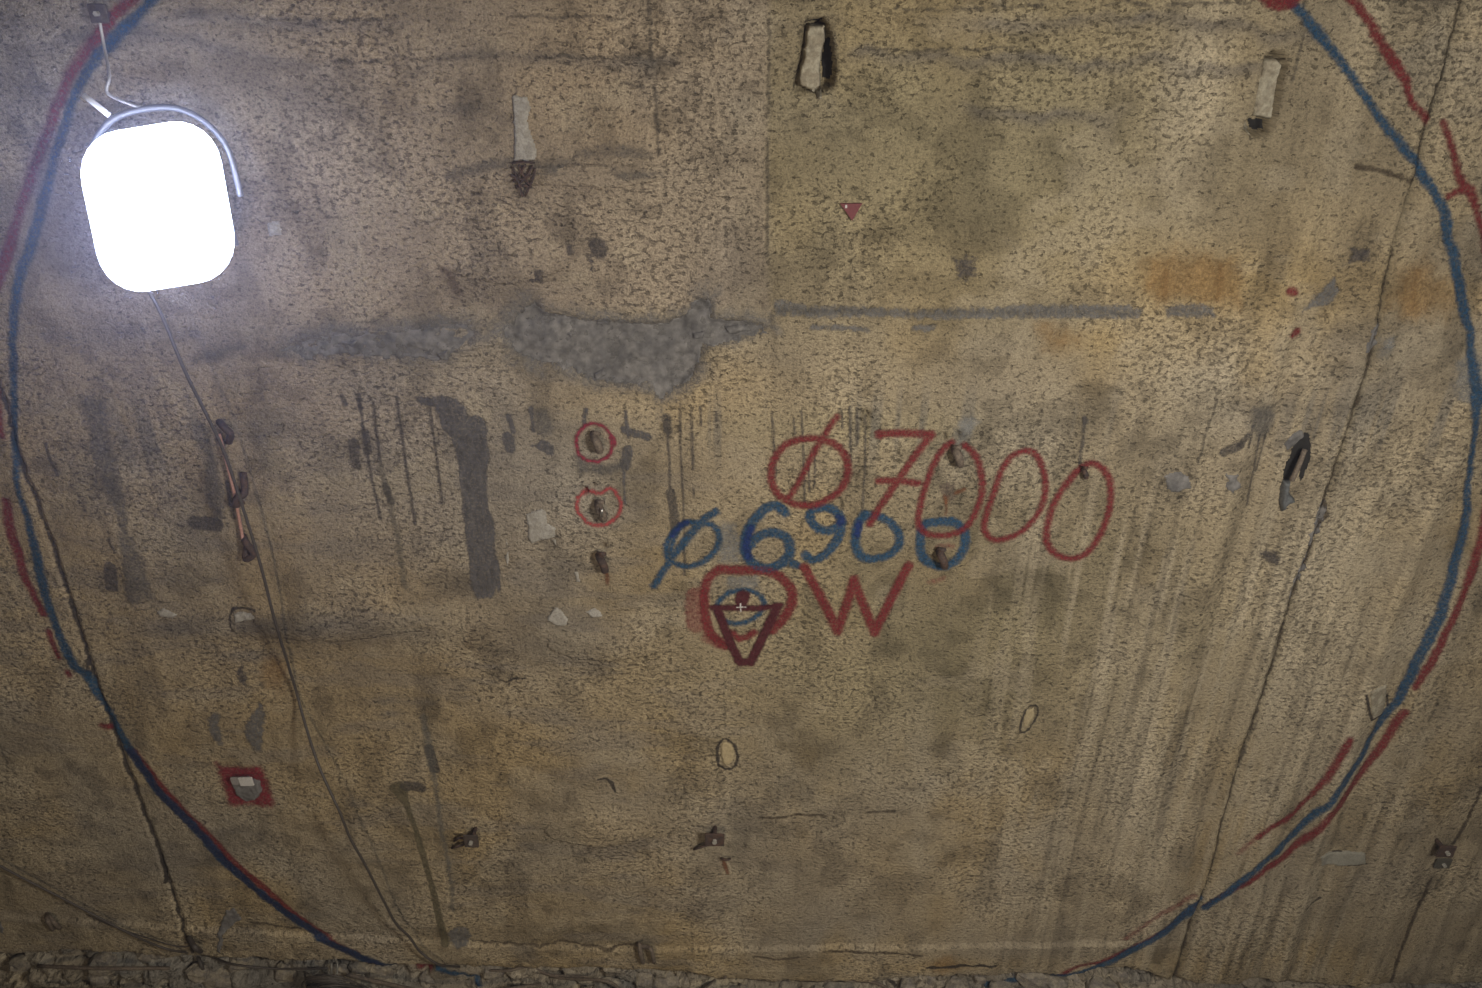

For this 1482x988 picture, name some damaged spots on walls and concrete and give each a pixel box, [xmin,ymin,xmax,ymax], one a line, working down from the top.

crack [1355,0,1461,186]
crack [0,385,194,954]
crack [1172,250,1393,977]
crack [1451,787,1482,846]
spalling [0,908,1482,988]
crack [1389,880,1432,983]